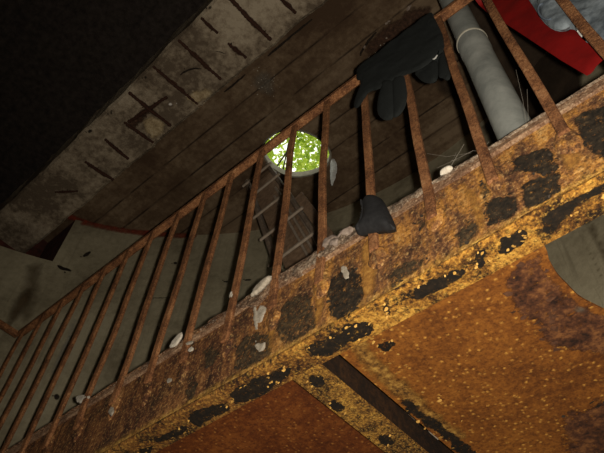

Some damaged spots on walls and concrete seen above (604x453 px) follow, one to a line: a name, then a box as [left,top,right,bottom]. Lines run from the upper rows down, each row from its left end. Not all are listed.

rust [362,243,375,296]
rust [353,338,470,439]